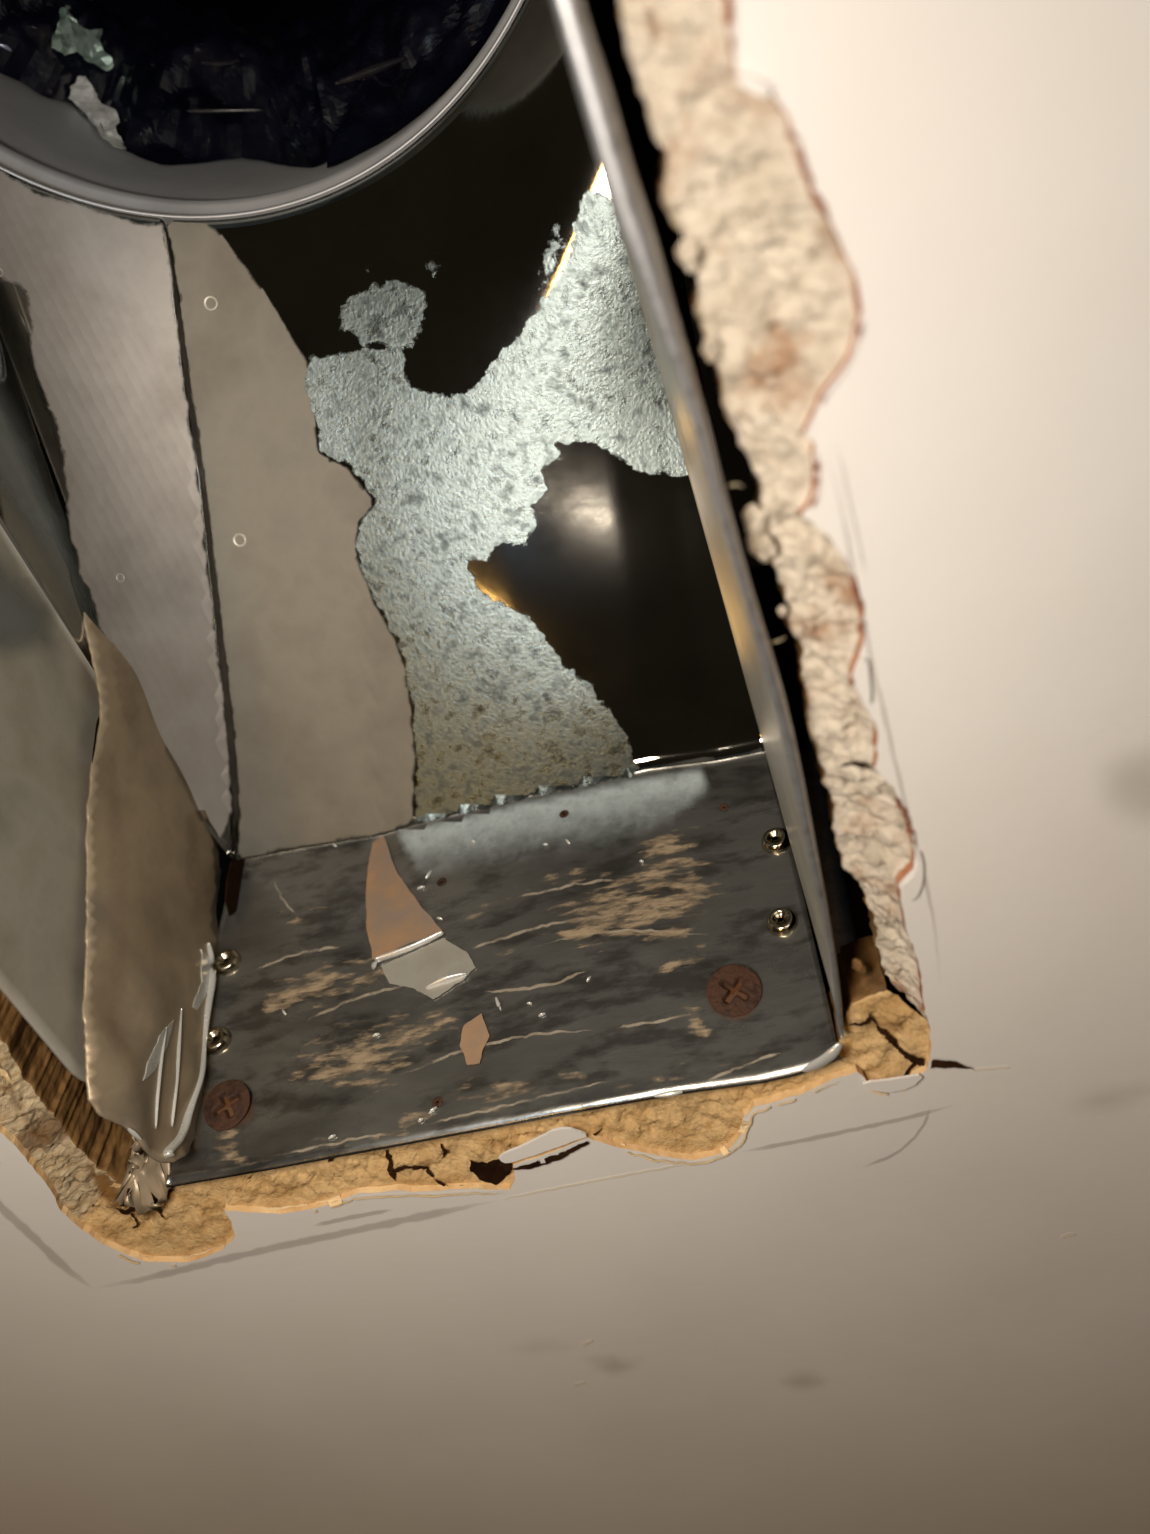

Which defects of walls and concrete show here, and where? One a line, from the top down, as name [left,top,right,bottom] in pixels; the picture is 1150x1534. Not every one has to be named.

flaking render [0,0,929,1267]
crack [385,1144,462,1186]
crack [512,1125,602,1170]